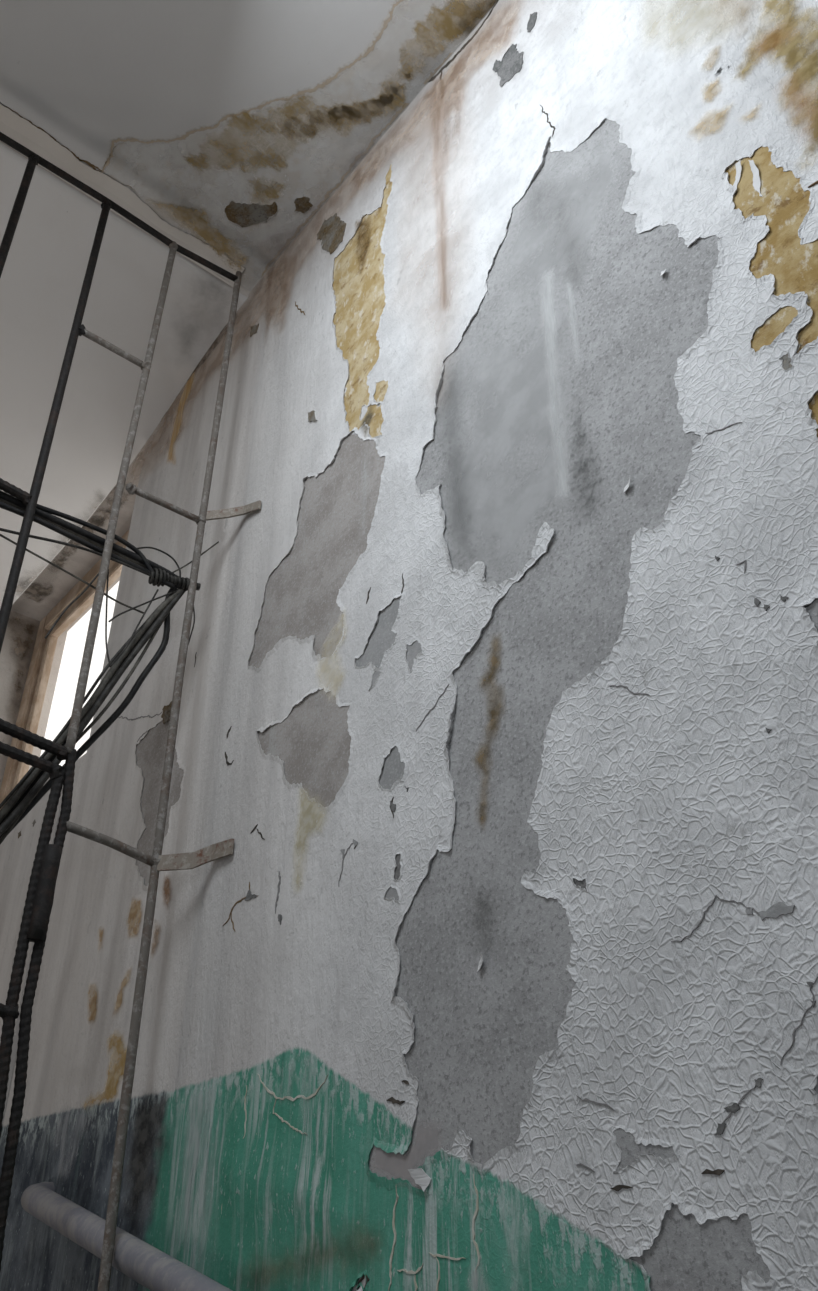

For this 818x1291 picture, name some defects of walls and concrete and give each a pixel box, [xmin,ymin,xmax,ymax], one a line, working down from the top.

damp [102,0,497,278]
spalling [492,10,540,88]
damp [739,0,818,150]
spalling [222,195,313,228]
peeling [248,163,394,673]
peeling [134,719,186,891]
peeling [256,685,355,812]
peeling [354,592,424,691]
corrosion [476,640,501,770]
peeling [366,114,725,1197]
peeling [797,593,818,659]
peeling [624,1191,778,1291]